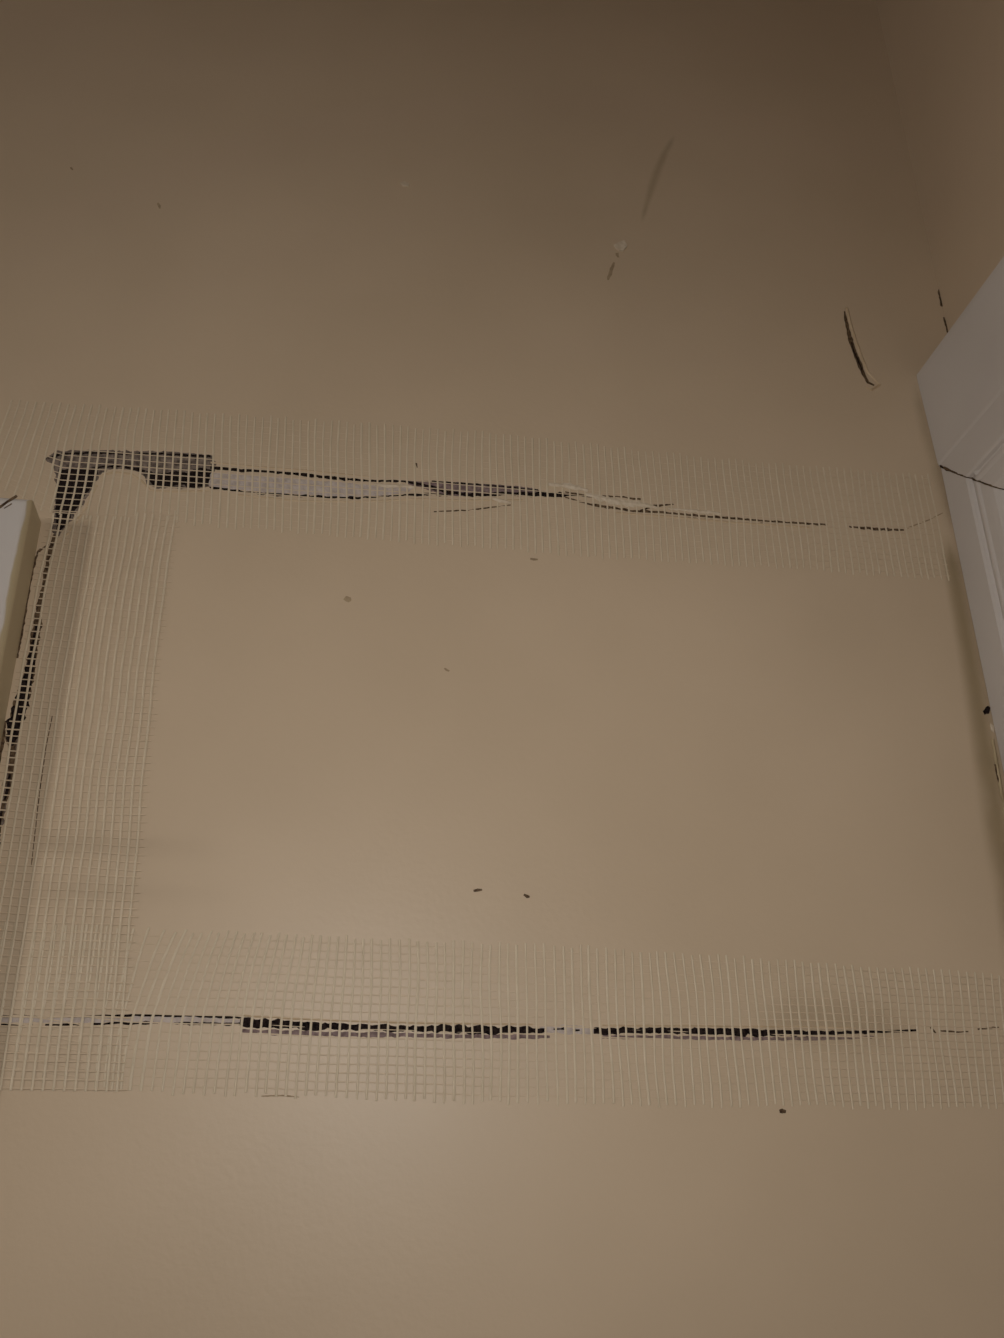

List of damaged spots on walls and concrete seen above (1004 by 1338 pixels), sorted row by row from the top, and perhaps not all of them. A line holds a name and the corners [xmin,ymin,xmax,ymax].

crack [844,311,874,386]
crack [209,462,943,531]
crack [940,465,1004,490]
crack [0,534,59,867]
crack [1,1014,999,1041]